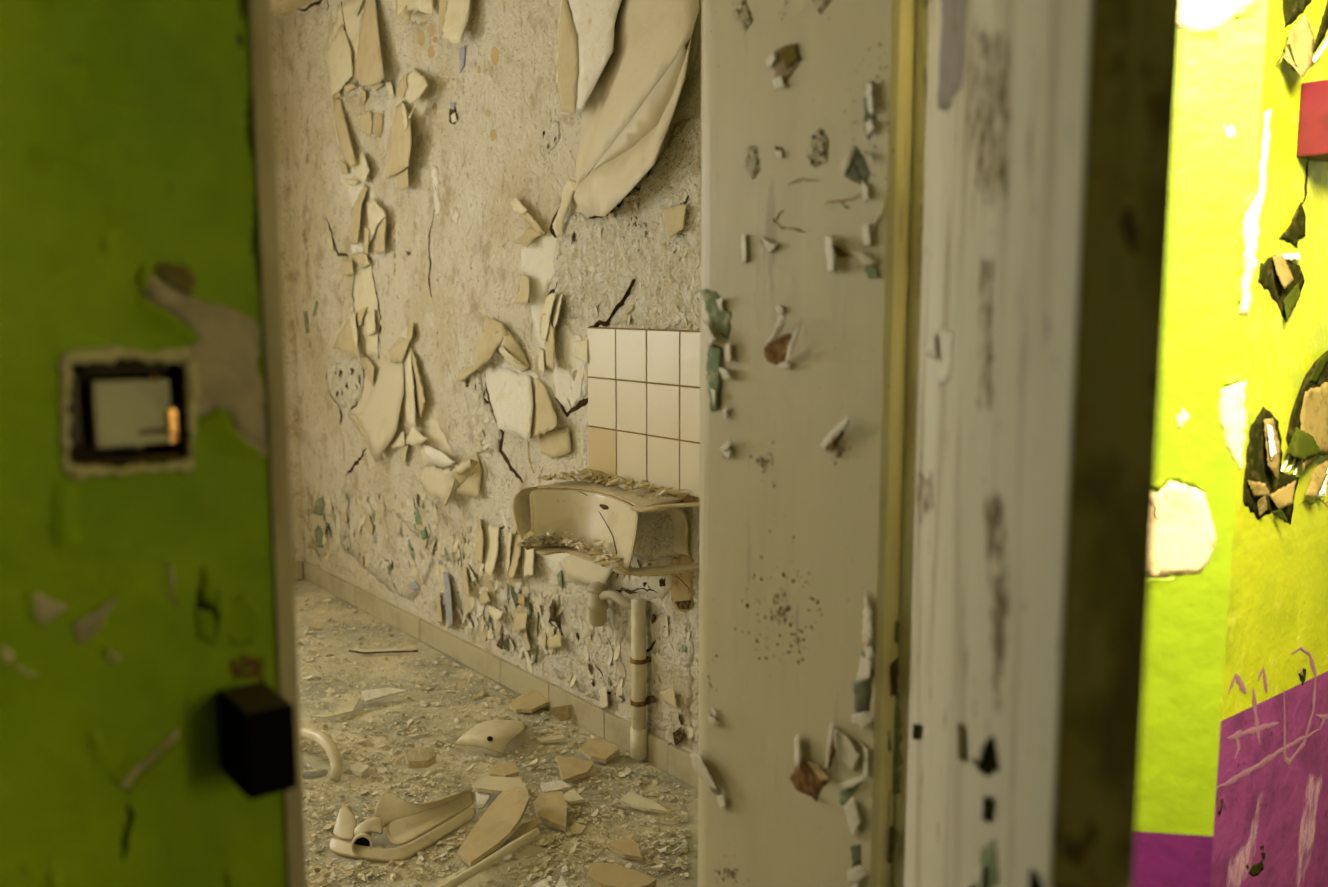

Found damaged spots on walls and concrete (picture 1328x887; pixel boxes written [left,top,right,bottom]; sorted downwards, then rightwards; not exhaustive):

spalling [732,0,753,32]
spalling [765,43,801,90]
peeling [1181,0,1328,77]
peeling [806,81,887,279]
peeling [1230,109,1305,322]
peeling [119,262,269,471]
flaking render [307,0,733,809]
peeling [764,304,800,370]
peeling [1215,350,1328,524]
peeling [790,590,921,887]
peeling [957,722,1000,777]
peeling [982,796,993,823]